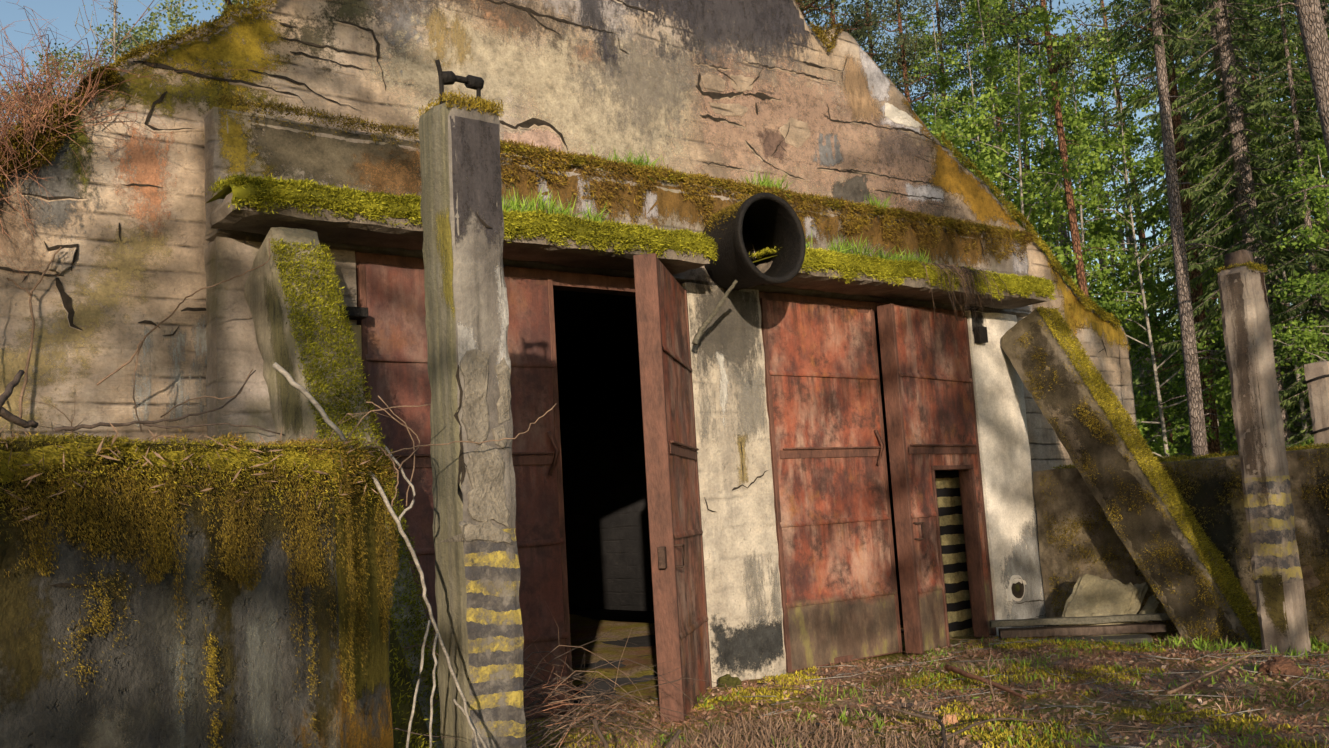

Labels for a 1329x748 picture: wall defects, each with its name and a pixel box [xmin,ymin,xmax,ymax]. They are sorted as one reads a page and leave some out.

crack [499,118,568,152]
damp [370,0,1028,274]
crack [694,57,985,259]
crack [0,241,83,331]
spalling [440,349,511,544]